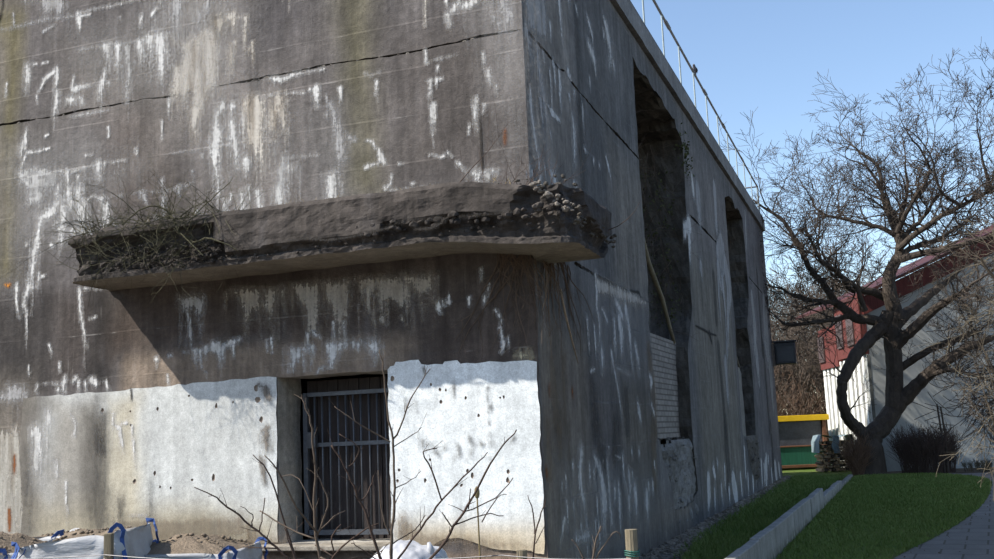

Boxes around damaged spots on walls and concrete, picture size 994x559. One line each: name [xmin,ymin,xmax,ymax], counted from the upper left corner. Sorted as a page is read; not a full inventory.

efflorescence [13,0,91,33]
efflorescence [26,62,110,119]
efflorescence [91,0,254,133]
crack [0,29,638,158]
damp [192,72,386,211]
efflorescence [181,296,240,361]
damp [226,282,379,374]
damp [359,275,431,323]
efflorescence [52,363,108,391]
damp [562,273,655,556]
spalling [661,439,699,523]